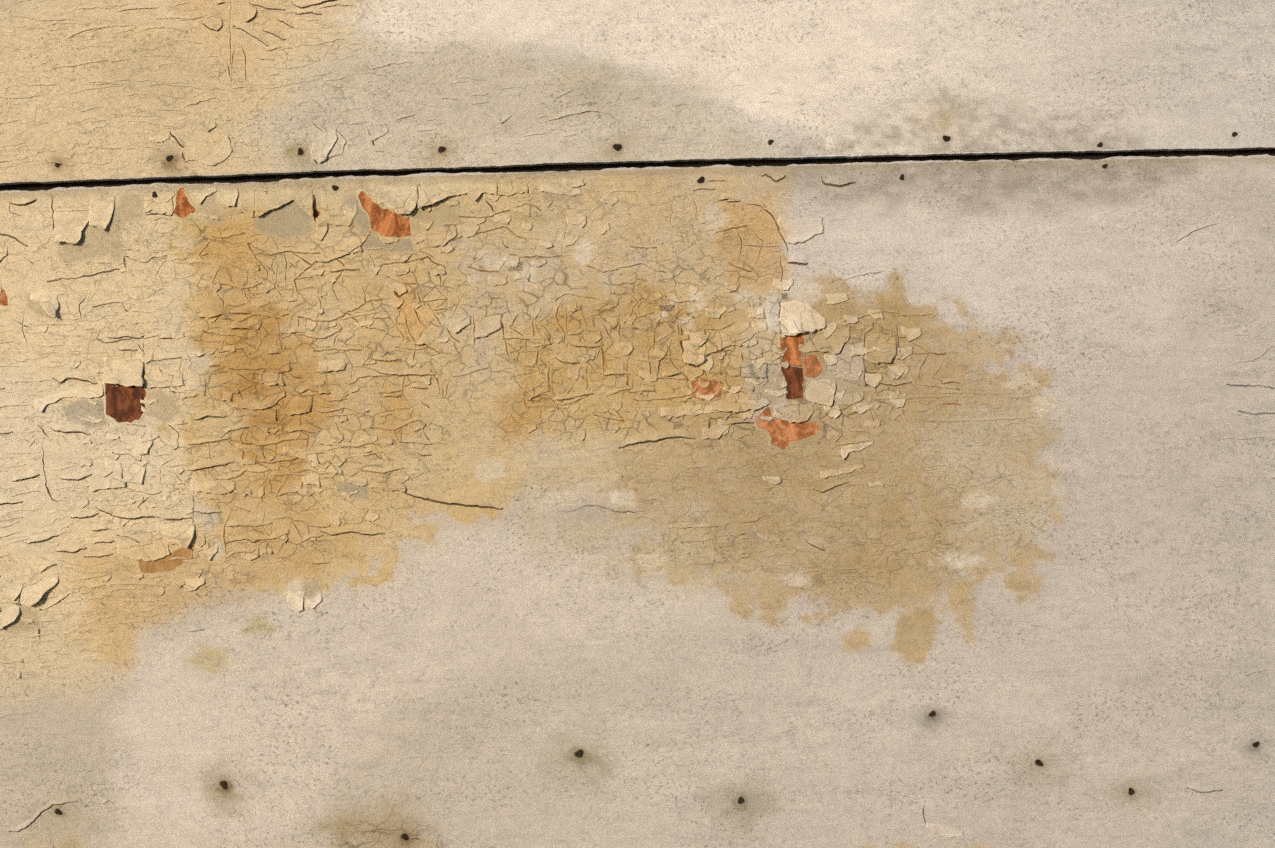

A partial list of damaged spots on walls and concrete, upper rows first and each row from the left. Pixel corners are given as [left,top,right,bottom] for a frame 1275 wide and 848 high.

leakage [0,0,405,182]
peeling [280,98,349,165]
peeling [762,170,786,182]
peeling [820,176,855,187]
peeling [567,179,930,493]
peeling [0,179,610,602]
leakage [0,73,1275,726]
rust [75,194,516,691]
peeling [954,489,1003,513]
peeling [926,539,988,572]
peeling [0,560,70,639]
peeling [276,575,328,616]